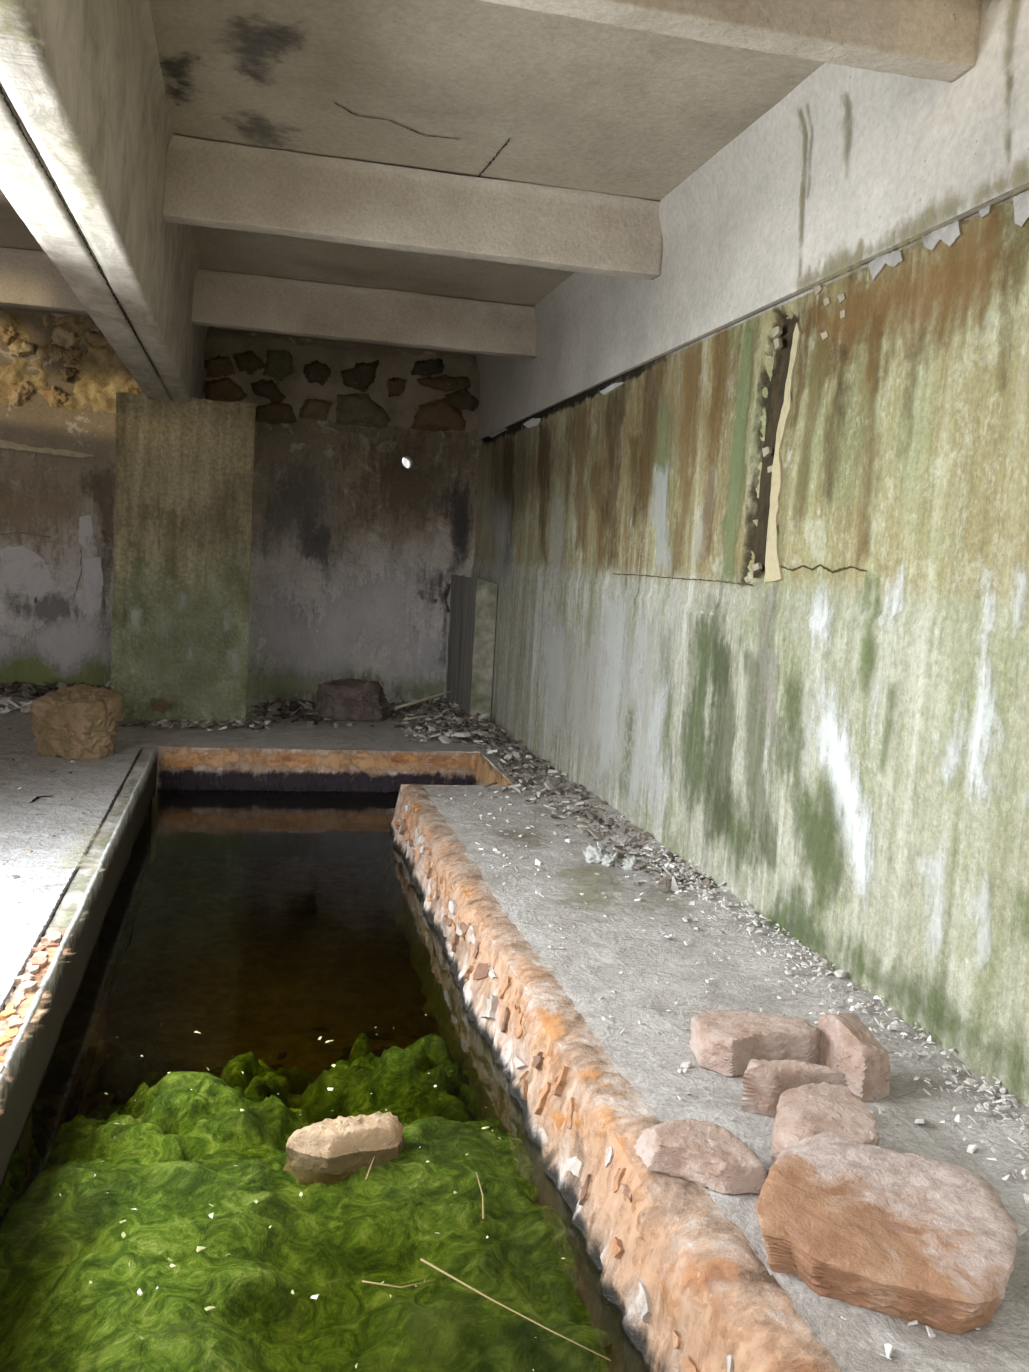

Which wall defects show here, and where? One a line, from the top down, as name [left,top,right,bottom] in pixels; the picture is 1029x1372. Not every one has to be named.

peeling [1013,190,1029,227]
peeling [922,221,964,250]
peeling [869,250,905,281]
spalling [812,285,847,319]
spalling [741,310,802,584]
leakage [652,468,671,570]
crack [613,573,753,586]
crack [781,564,867,573]
leakage [809,594,829,641]
leakage [851,577,903,686]
efflorescence [944,662,996,799]
efflorescence [808,686,874,895]